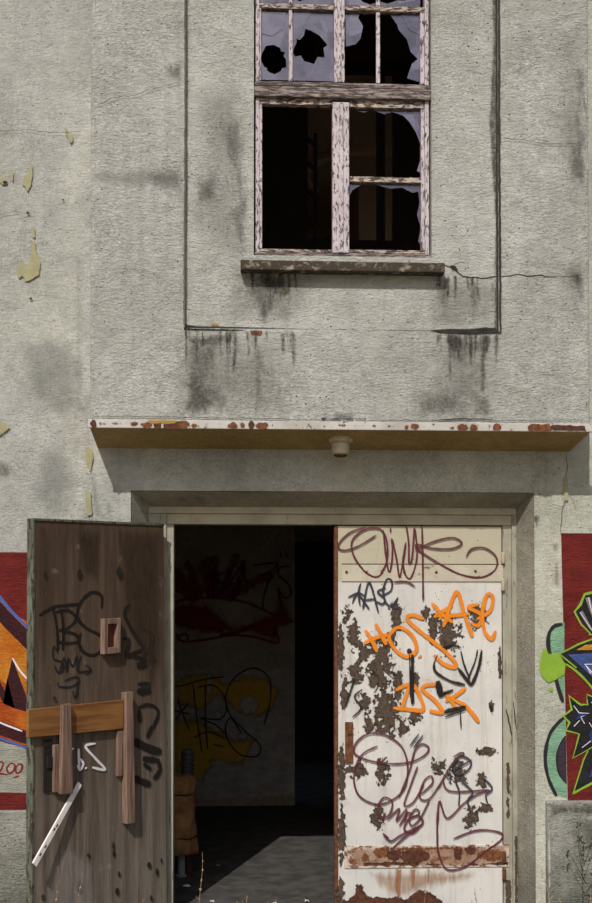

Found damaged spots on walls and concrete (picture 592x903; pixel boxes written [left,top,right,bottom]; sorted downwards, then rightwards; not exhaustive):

damp [431,0,502,375]
peeling [17,227,40,281]
crack [445,262,578,279]
corrosion [90,420,197,429]
corrosion [227,421,268,430]
corrosion [528,423,586,432]
crack [547,458,576,530]